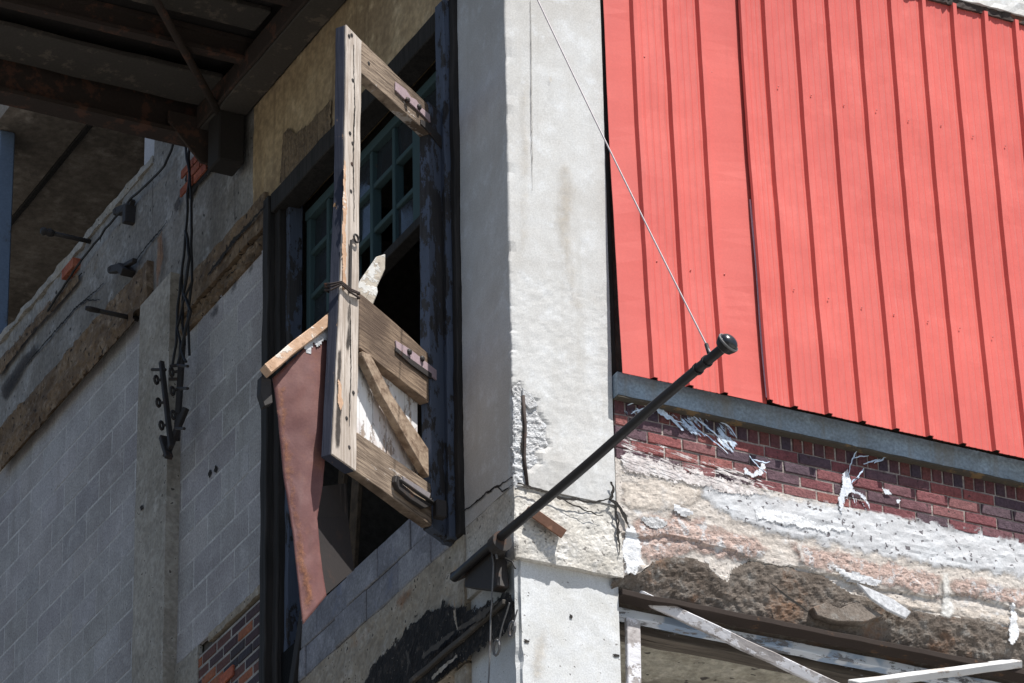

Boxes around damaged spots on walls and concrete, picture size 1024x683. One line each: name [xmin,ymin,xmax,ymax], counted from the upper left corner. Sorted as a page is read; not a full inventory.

spalling [510,382,548,489]
crack [463,476,630,555]
spalling [611,504,1024,669]